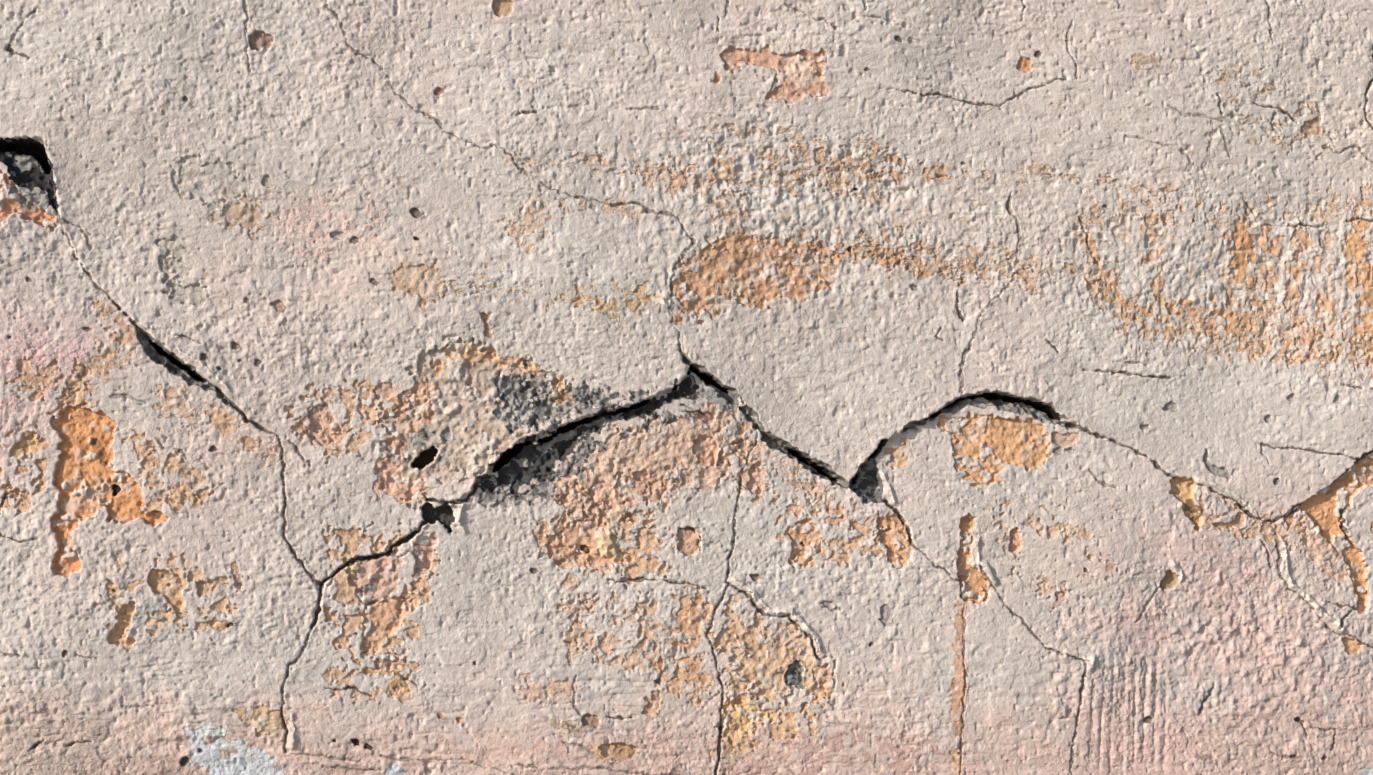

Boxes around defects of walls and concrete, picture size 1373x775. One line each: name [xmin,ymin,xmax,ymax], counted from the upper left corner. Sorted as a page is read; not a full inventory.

crack [6,10,35,59]
crack [1324,45,1373,163]
peeling [389,108,1373,403]
crack [1242,194,1373,227]
spalling [0,299,289,577]
spalling [94,549,245,651]
crack [0,137,678,775]
peeling [284,313,913,759]
crack [326,3,1175,775]
spalling [938,412,1080,487]
spalling [1169,450,1373,655]
crack [1198,443,1373,649]